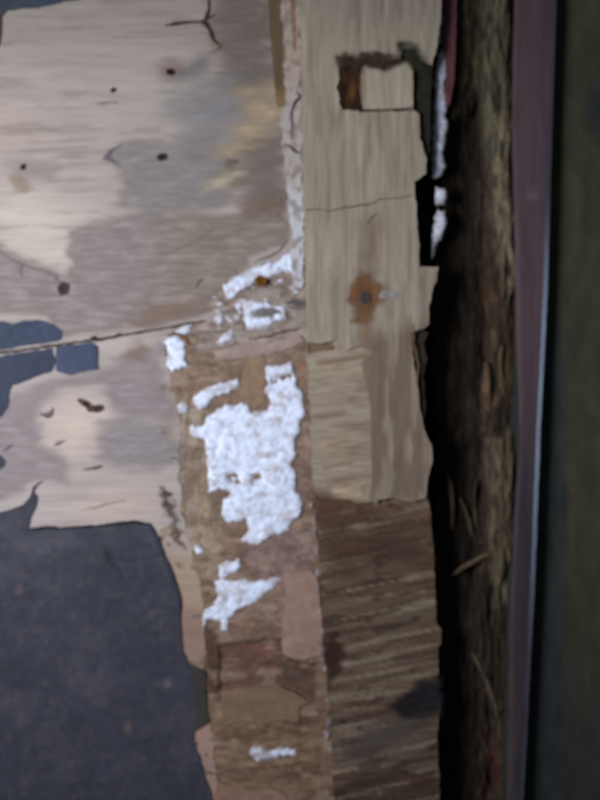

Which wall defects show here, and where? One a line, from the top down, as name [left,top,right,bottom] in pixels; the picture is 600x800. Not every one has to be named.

crack [164,0,223,52]
crack [306,195,411,225]
peeling [213,289,247,328]
corrosion [255,275,267,286]
corrosion [349,274,382,323]
crack [0,321,205,354]
peeling [0,320,98,417]
peeling [193,335,304,410]
peeling [77,398,104,413]
peeling [218,559,242,578]
peeling [281,571,323,660]
peeling [0,491,213,800]